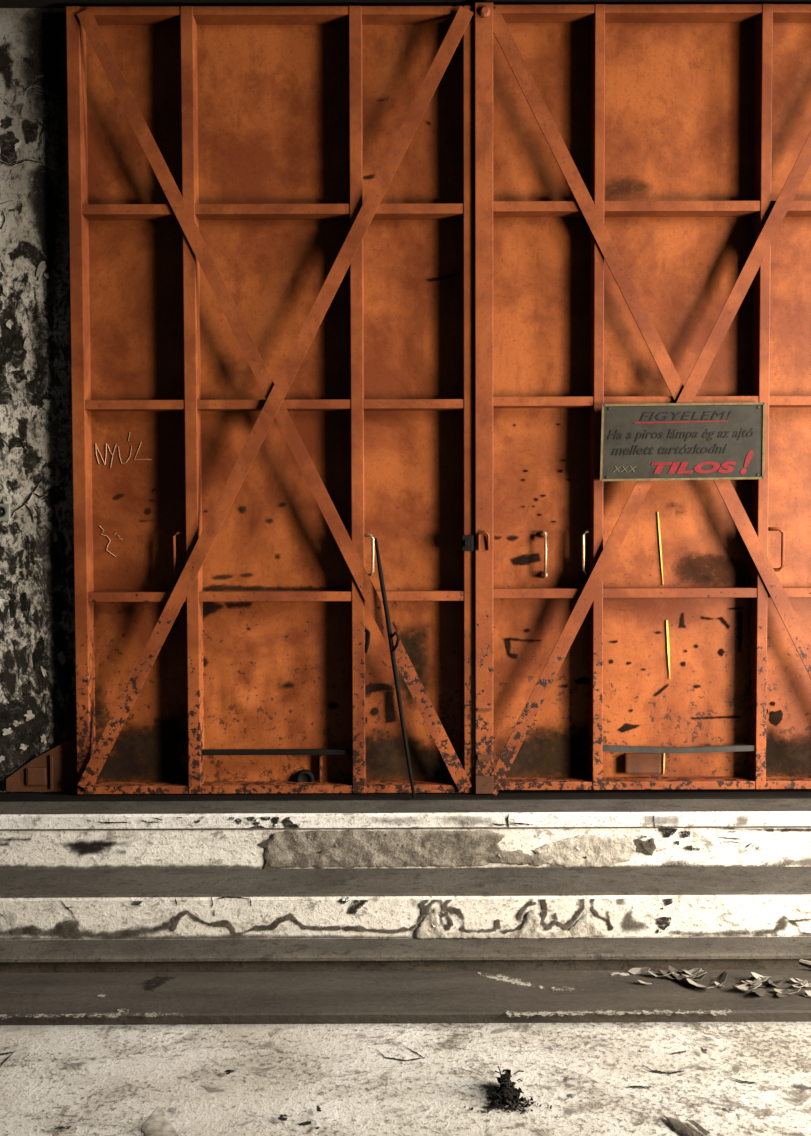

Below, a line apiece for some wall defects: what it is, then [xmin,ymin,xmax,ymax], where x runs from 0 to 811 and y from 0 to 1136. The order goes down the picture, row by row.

peeling [0,272,53,411]
peeling [0,418,42,492]
peeling [0,522,36,618]
rust [203,573,345,619]
rust [505,628,541,659]
peeling [0,591,71,776]
rust [365,683,396,723]
rust [618,709,640,732]
spalling [229,817,700,869]
crack [211,896,251,916]
crack [377,1047,425,1061]
crack [140,1105,179,1136]